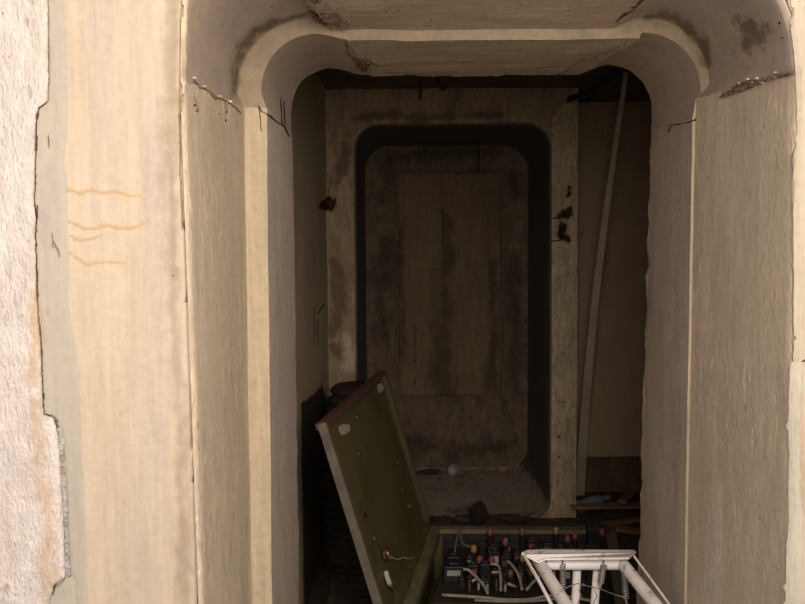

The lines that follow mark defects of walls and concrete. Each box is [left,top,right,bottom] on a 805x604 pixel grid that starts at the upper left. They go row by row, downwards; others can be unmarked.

crack [617,0,644,22]
crack [179,77,290,226]
water stain [329,259,354,372]
spalling [52,414,71,577]